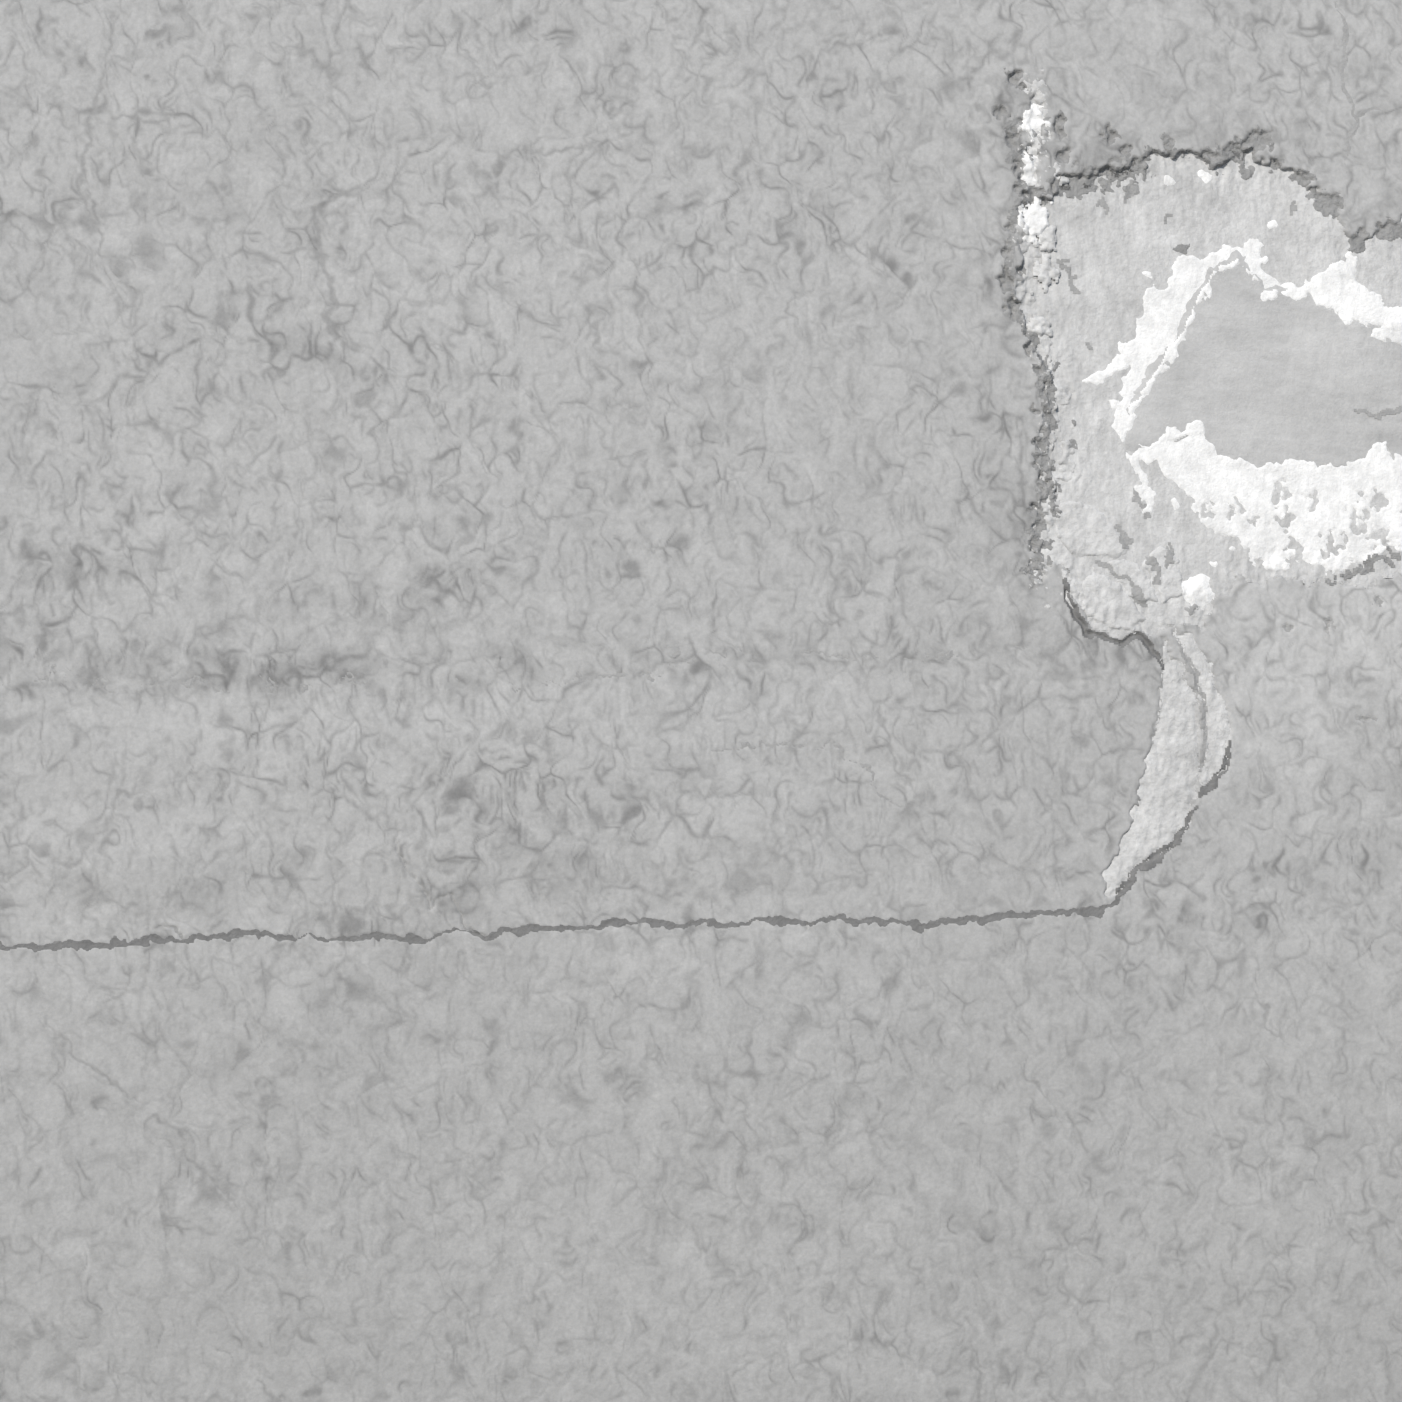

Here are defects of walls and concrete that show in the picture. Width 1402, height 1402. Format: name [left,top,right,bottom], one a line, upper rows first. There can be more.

flaking render [1018,122,1402,900]
crack [0,849,1133,952]